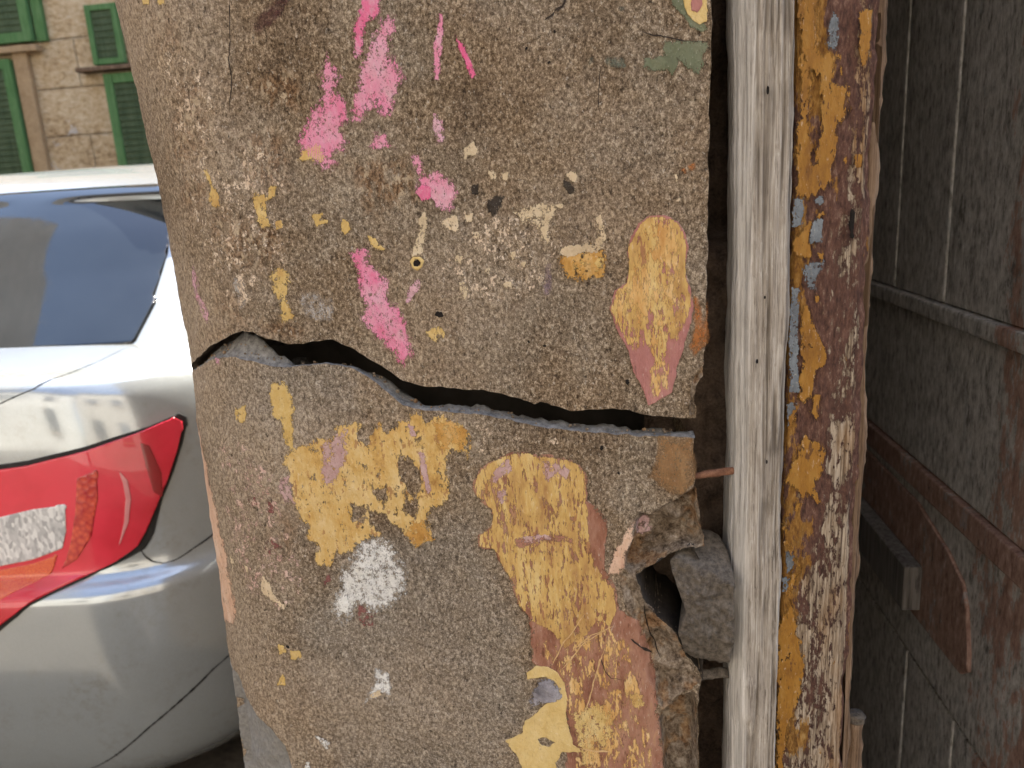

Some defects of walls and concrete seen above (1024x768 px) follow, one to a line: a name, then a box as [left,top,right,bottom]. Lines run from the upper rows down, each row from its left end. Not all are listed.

crack [192,331,695,438]
peeling [196,381,704,768]